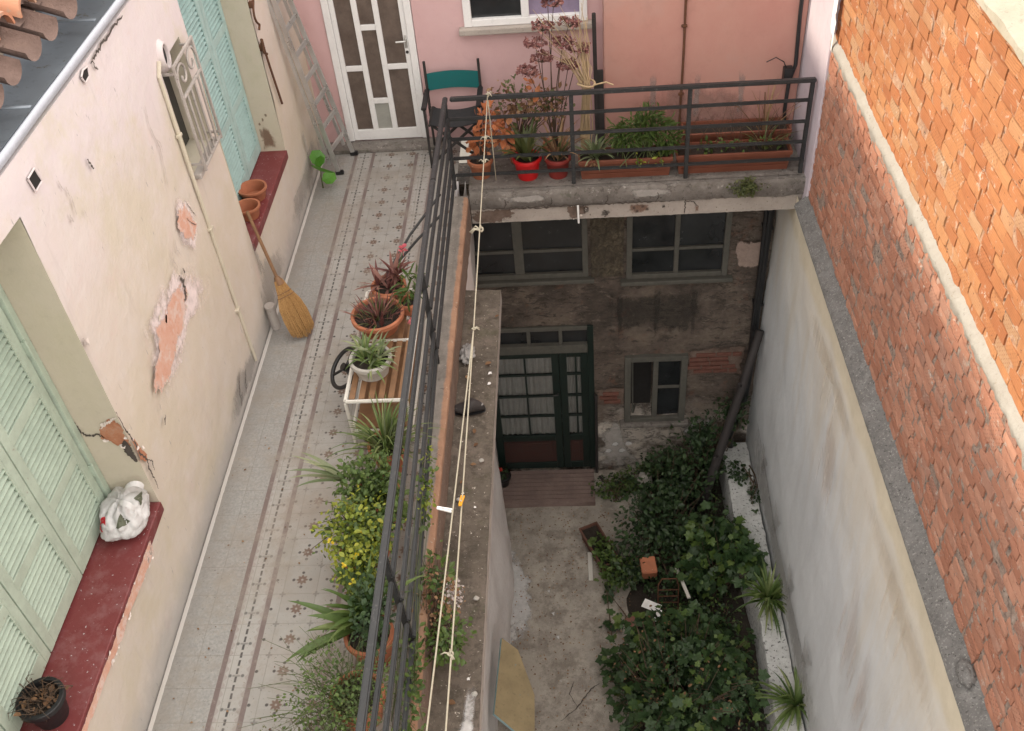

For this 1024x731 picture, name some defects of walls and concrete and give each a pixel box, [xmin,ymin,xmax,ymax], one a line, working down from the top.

crack [91,16,122,69]
peeling [151,201,203,424]
spalling [77,418,138,462]
crack [116,412,158,487]